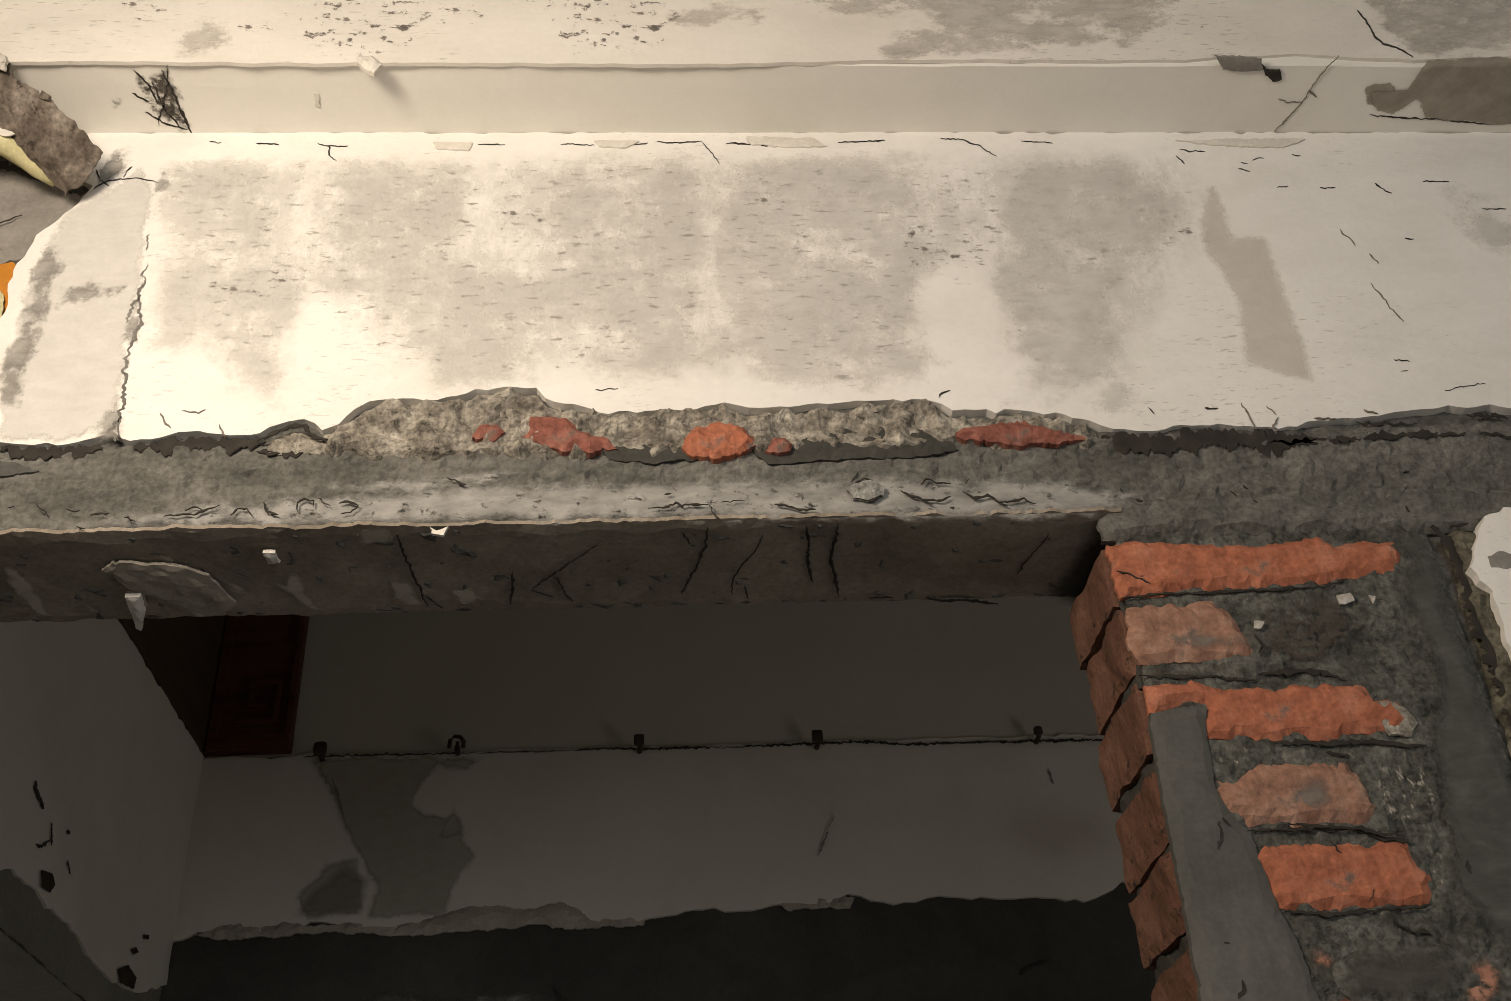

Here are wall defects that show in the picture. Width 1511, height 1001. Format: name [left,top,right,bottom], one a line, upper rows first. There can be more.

crack [1357,10,1413,58]
crack [1274,55,1339,132]
peeling [0,262,16,318]
peeling [168,168,707,370]
peeling [725,169,1020,379]
spalling [267,387,1099,466]
crack [396,534,444,609]
crack [510,542,601,604]
peeling [1488,551,1511,569]
spalling [1377,701,1418,738]